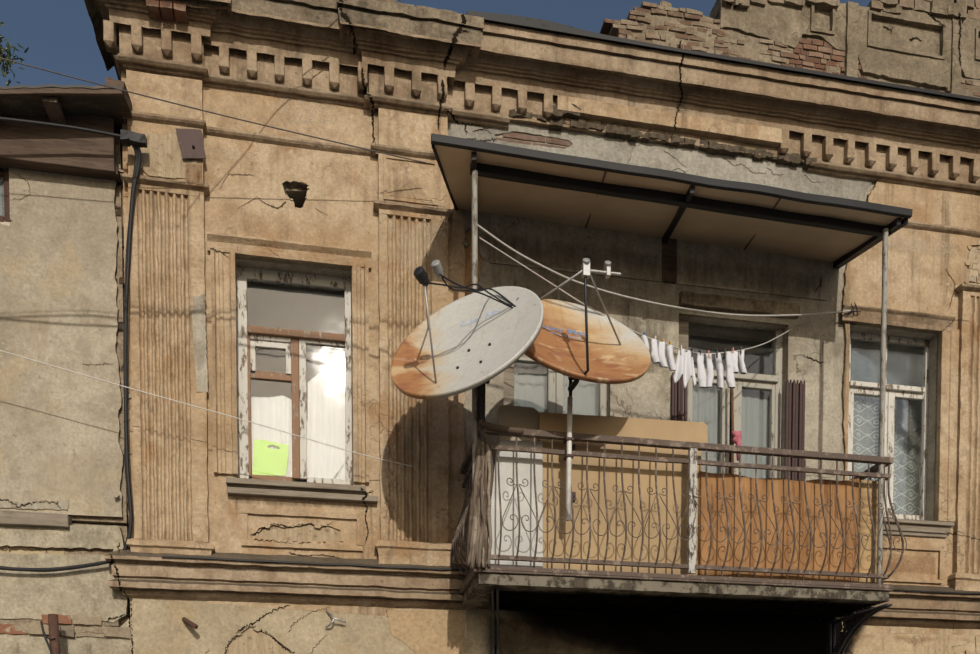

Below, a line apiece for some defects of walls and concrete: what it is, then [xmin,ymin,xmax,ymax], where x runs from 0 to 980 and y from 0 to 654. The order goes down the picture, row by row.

crack [336,0,375,143]
crack [437,14,497,142]
crack [667,41,687,167]
spalling [714,29,845,75]
spalling [945,77,980,98]
hole [282,180,309,202]
spalling [964,245,980,285]
crack [0,499,61,509]
crack [361,488,373,544]
crack [251,523,339,559]
crack [205,605,328,654]